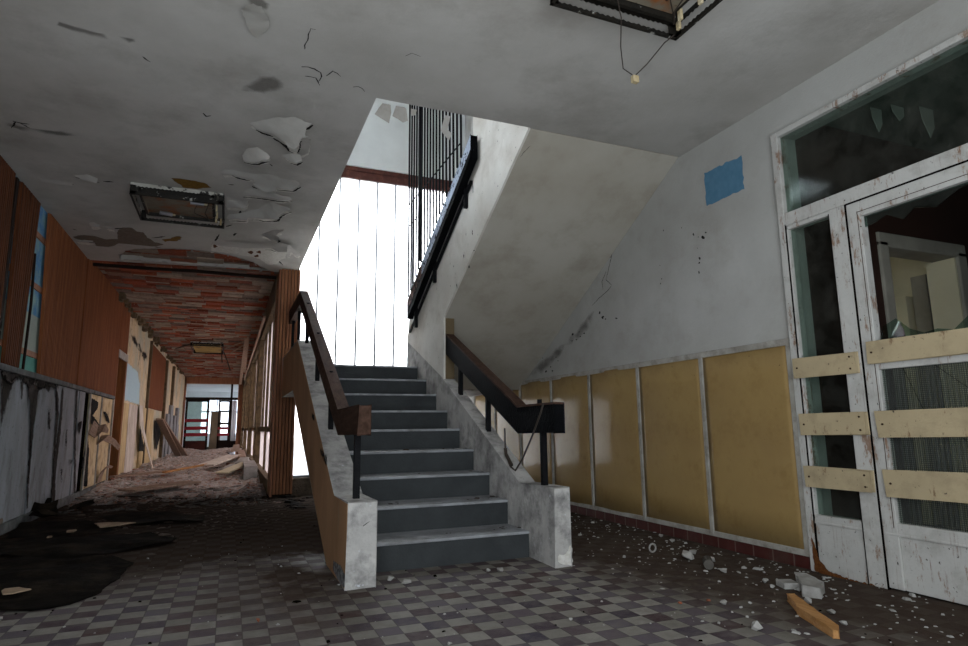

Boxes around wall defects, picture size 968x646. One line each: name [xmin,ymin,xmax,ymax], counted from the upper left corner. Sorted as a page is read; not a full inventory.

peeling [249,117,313,166]
peeling [118,147,301,272]